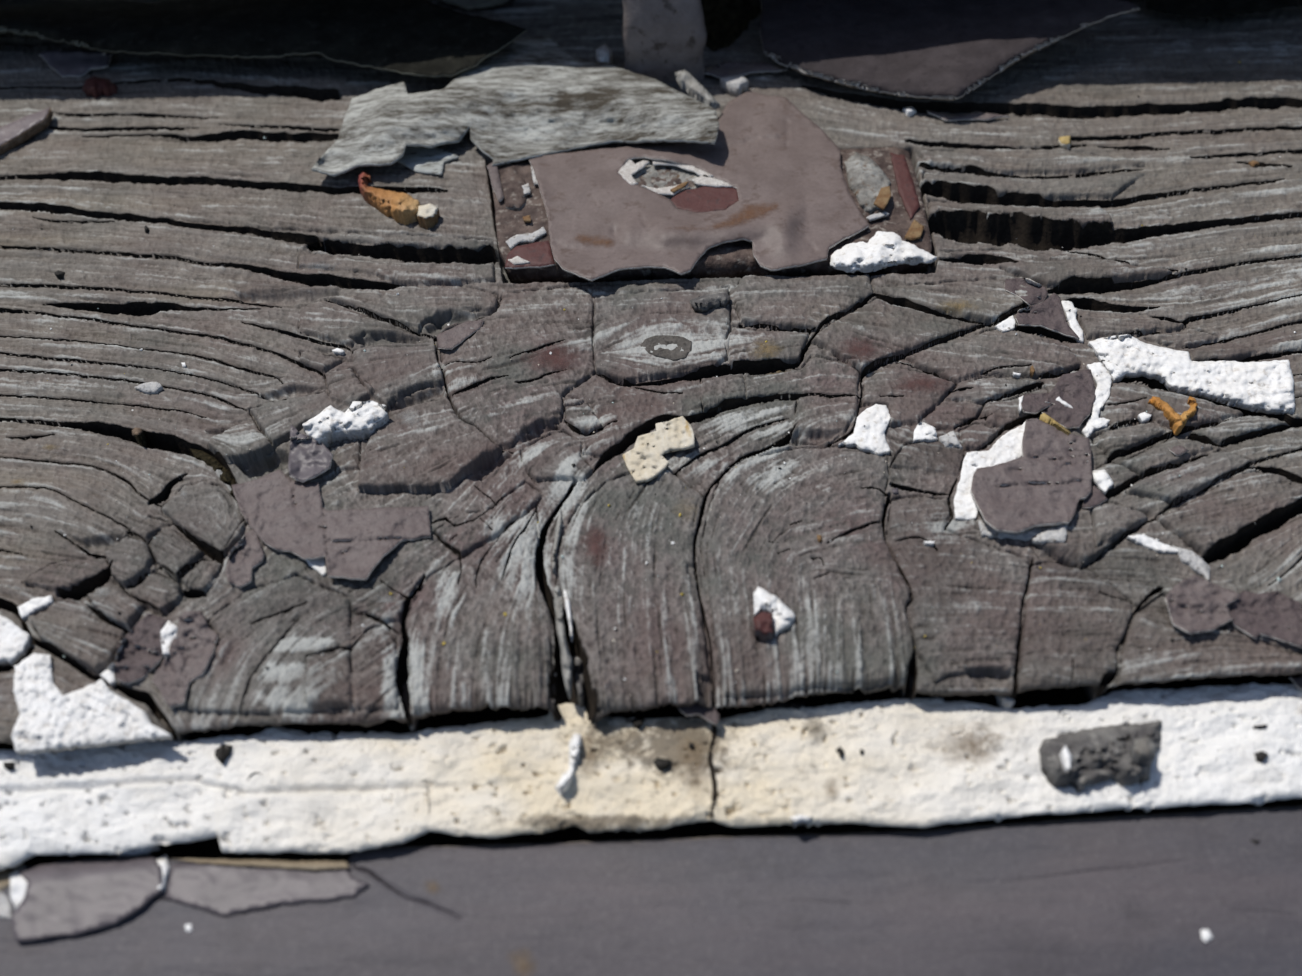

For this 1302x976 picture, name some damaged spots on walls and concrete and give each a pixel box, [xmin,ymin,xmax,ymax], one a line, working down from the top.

peeling [311,35,869,281]
peeling [1004,278,1080,340]
peeling [225,425,431,588]
crack [0,77,1302,818]
peeling [970,369,1108,534]
peeling [114,611,219,709]
peeling [0,856,369,943]